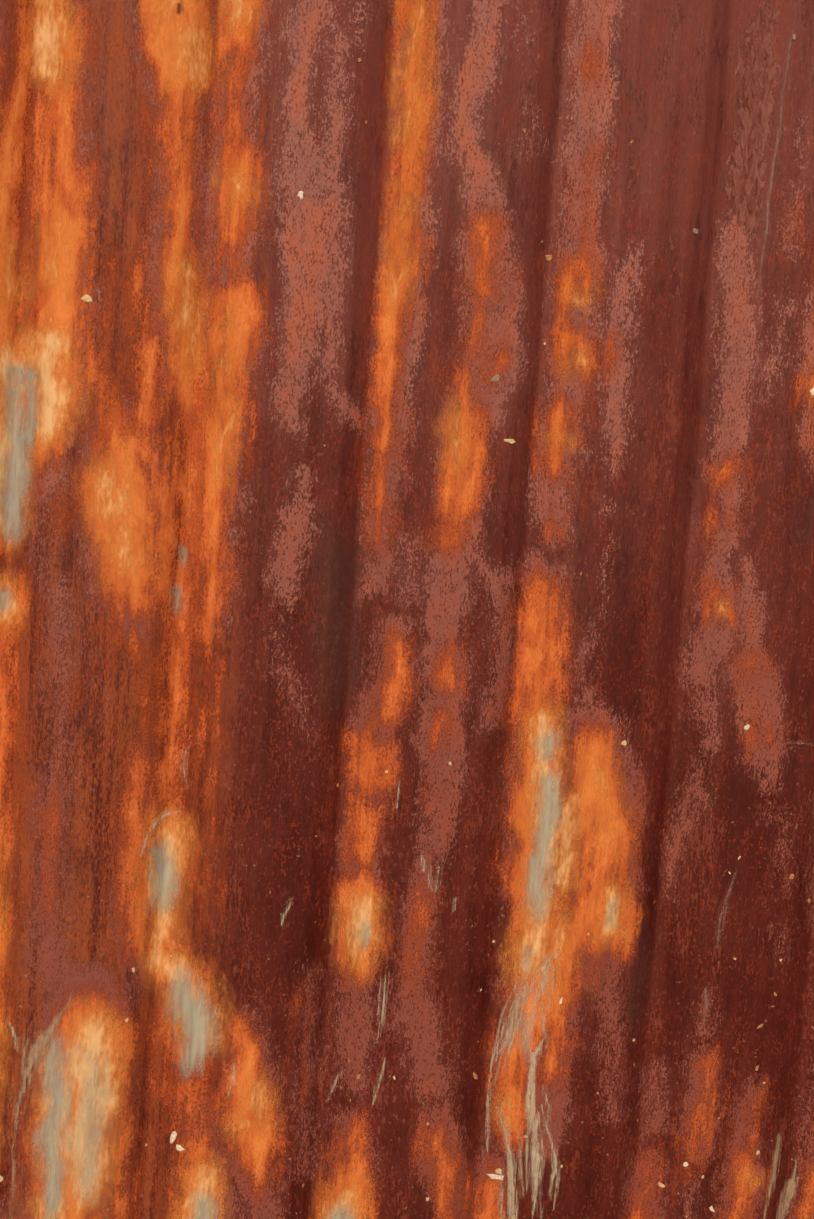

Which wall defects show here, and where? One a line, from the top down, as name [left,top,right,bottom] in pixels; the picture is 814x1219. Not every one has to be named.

corrosion [260,453,324,744]
corrosion [656,108,814,964]